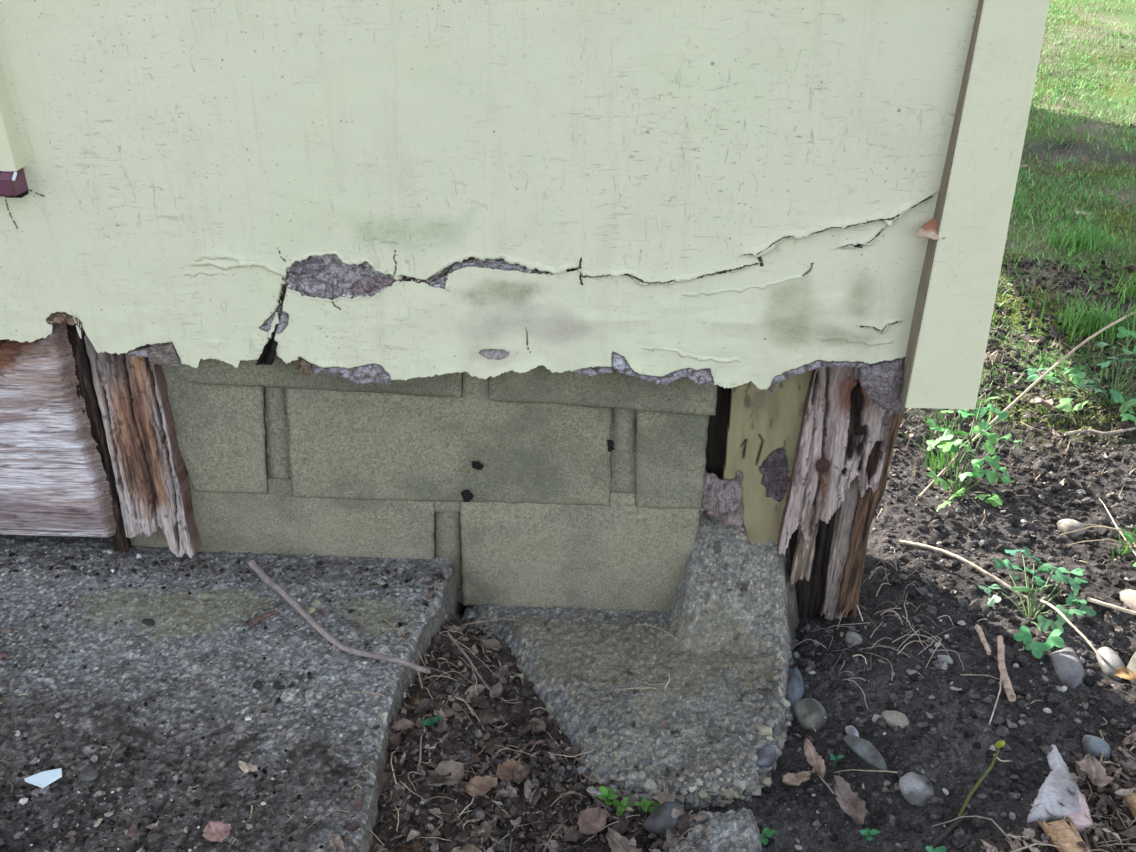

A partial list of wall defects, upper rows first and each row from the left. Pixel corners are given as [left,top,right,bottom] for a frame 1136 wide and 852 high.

spalling [280,251,403,303]
peeling [46,312,83,331]
crack [256,250,289,365]
peeling [125,342,181,366]
peeling [298,357,391,384]
peeling [479,349,509,360]
peeling [573,351,714,386]
spalling [768,358,907,414]
peeling [698,469,745,532]
peeling [759,448,790,502]